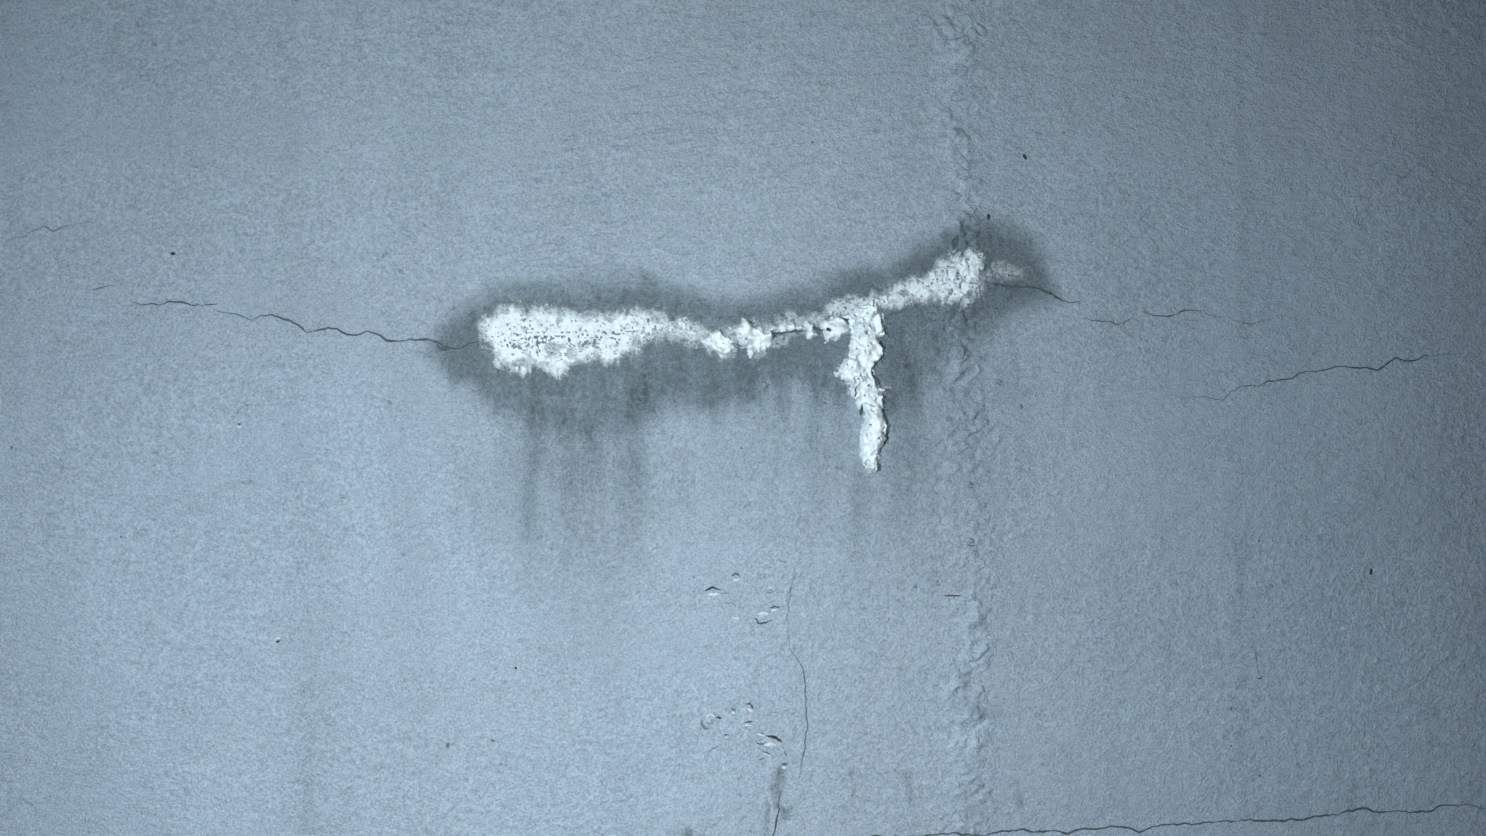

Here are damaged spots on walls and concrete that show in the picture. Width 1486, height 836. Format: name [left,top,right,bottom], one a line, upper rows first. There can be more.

crack [87,285,480,351]
crack [985,281,1269,327]
leakage [479,251,1017,473]
crack [1181,353,1486,400]
crack [772,561,808,836]
crack [872,804,1486,836]